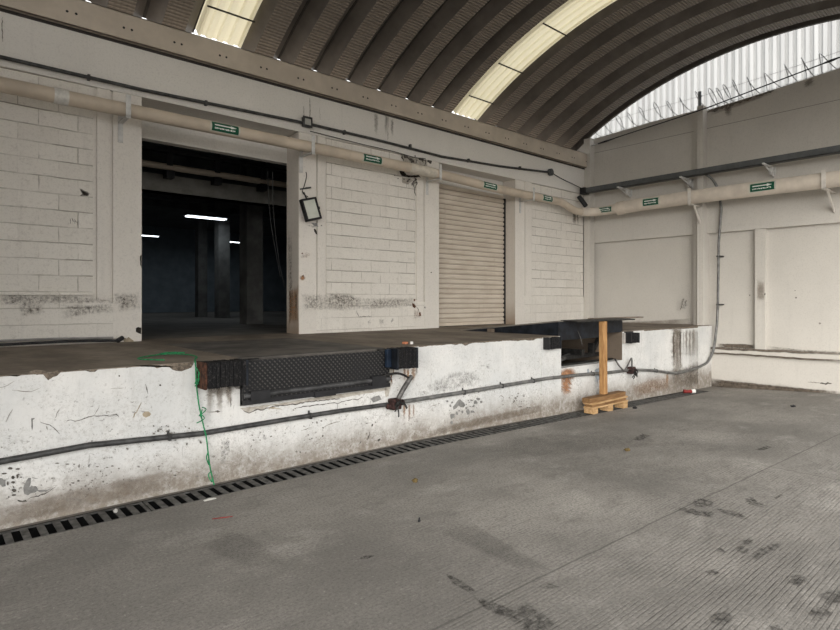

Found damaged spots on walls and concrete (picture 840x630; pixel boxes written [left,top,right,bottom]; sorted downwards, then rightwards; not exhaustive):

spalling [0,369,98,380]
spalling [127,361,194,371]
spalling [241,369,394,413]
corrosion [561,370,574,392]
water stain [643,331,694,392]
peeling [446,392,482,424]
peeling [0,467,53,502]